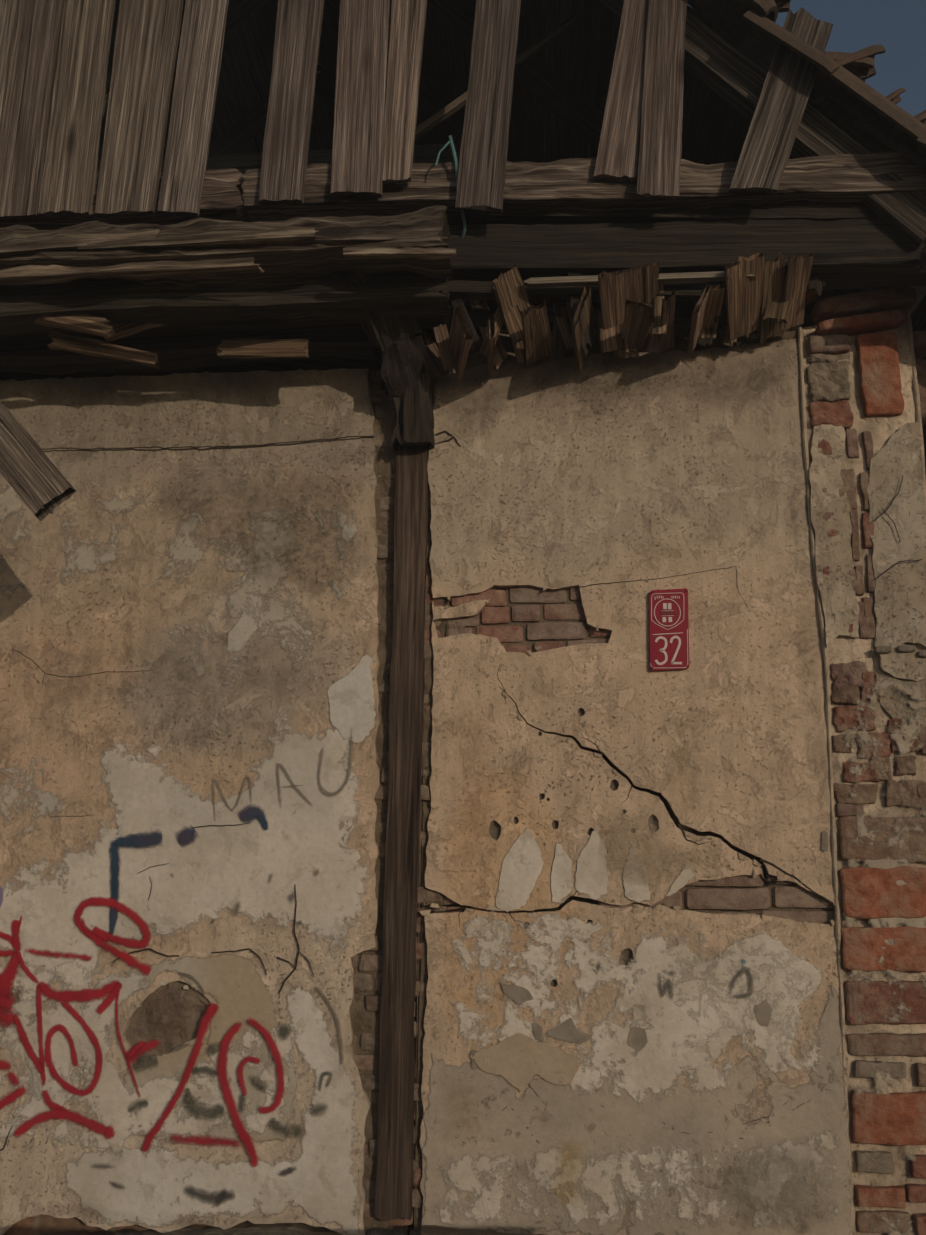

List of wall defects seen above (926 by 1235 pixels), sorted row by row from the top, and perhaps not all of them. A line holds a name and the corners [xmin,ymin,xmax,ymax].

peeling [151,507,315,685]
flaking render [424,576,612,656]
crack [497,665,833,904]
flaking render [874,645,926,657]
flaking render [875,674,926,728]
peeling [0,655,376,1235]
crack [419,891,598,923]
peeling [422,815,852,1235]